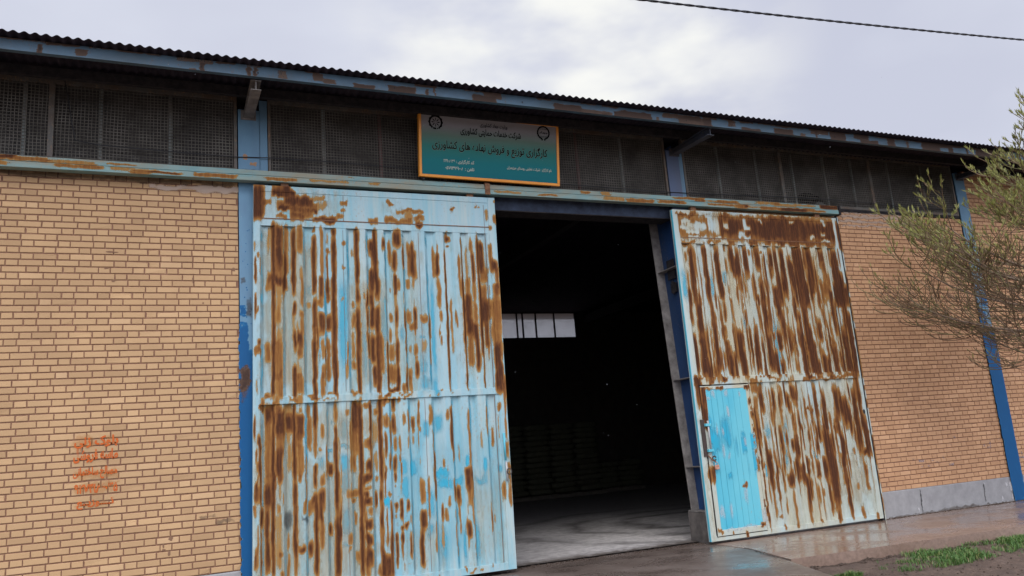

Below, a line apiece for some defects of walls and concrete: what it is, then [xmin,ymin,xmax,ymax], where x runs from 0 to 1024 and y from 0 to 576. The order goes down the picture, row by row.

corrosion [0,154,238,179]
corrosion [239,177,513,576]
corrosion [474,190,521,230]
corrosion [580,190,885,531]